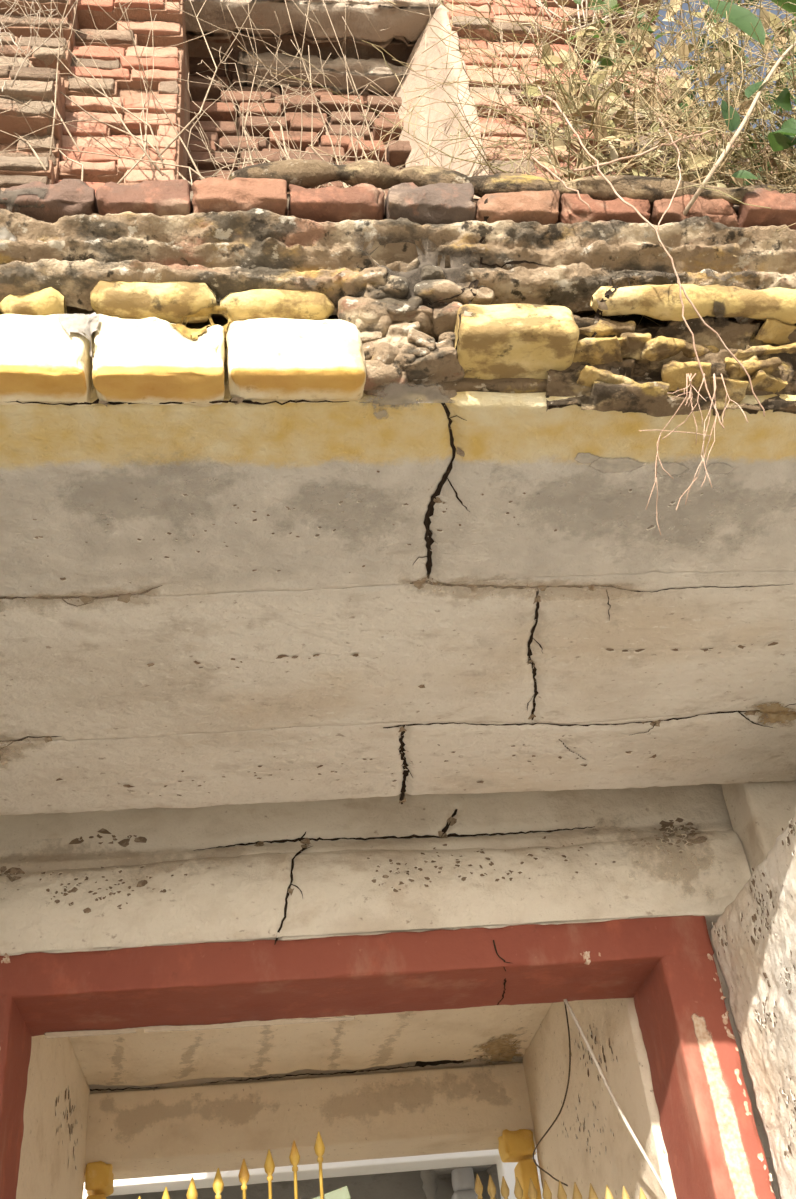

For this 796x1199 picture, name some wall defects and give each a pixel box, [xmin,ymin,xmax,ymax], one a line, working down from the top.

spalling [337,265,495,398]
crack [434,198,547,359]
crack [581,278,635,352]
spalling [545,315,796,417]
crack [383,384,794,804]
crack [193,809,595,945]
crack [493,940,510,1005]
peeling [707,922,738,1051]
crack [90,1084,164,1092]
crack [198,1040,517,1084]
flaking render [692,1014,774,1199]
peeling [774,1075,796,1159]